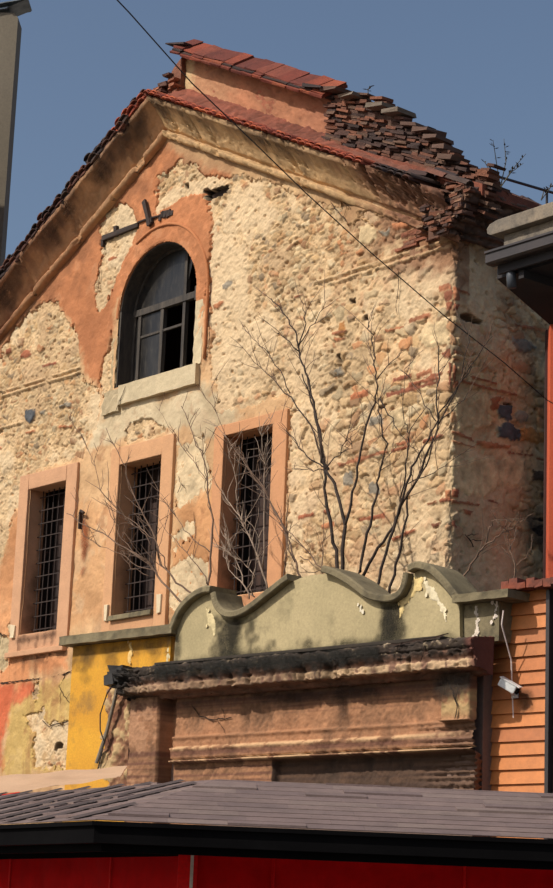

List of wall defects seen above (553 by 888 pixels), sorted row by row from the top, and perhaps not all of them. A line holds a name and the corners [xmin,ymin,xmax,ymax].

flaking render [94,203,138,312]
flaking render [154,159,550,637]
flaking render [0,299,113,559]
flaking render [0,618,11,673]
water stain [214,618,253,657]
water stain [371,602,403,642]
crack [0,670,72,729]
flaking render [26,680,69,771]
crack [192,706,232,732]
water stain [436,673,470,697]